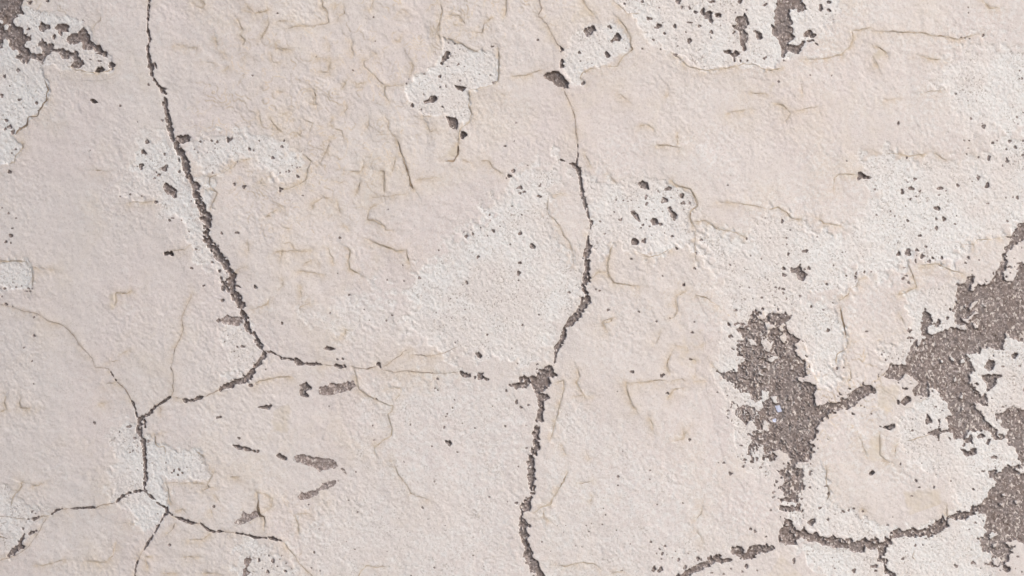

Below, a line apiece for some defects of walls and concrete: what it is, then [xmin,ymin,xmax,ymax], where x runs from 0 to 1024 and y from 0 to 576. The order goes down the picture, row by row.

peeling [0,0,121,174]
crack [0,0,638,576]
peeling [219,0,1024,576]